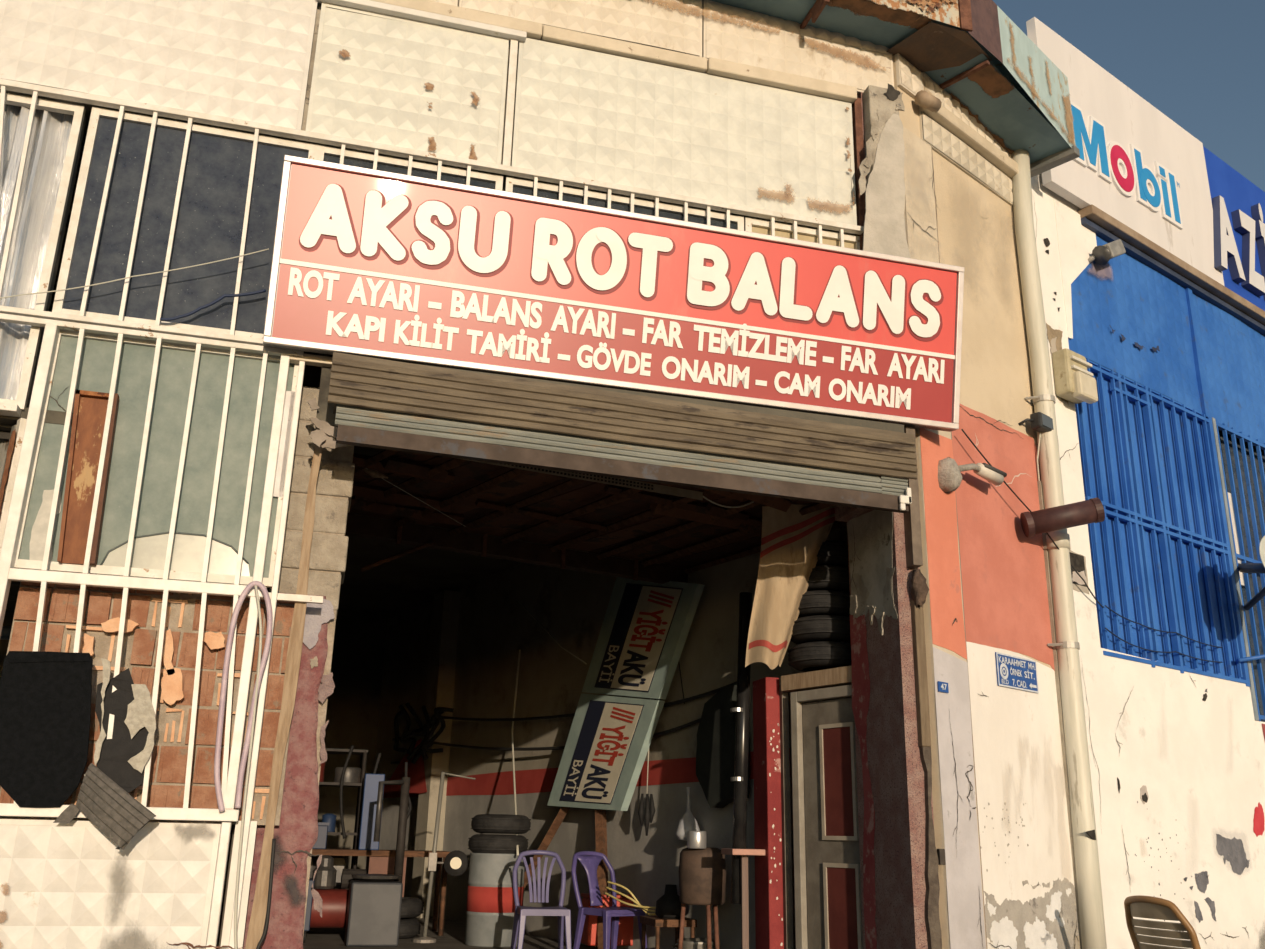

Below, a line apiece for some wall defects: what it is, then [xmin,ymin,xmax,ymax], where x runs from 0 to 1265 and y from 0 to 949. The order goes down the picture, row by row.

corrosion [648,0,886,71]
corrosion [827,0,959,30]
spalling [858,84,905,195]
peeling [303,599,335,704]
spalling [319,720,329,765]
crack [949,711,963,849]
spalling [311,855,323,918]
peeling [984,877,1081,949]
peeling [1184,871,1216,923]
peeling [1216,834,1250,875]